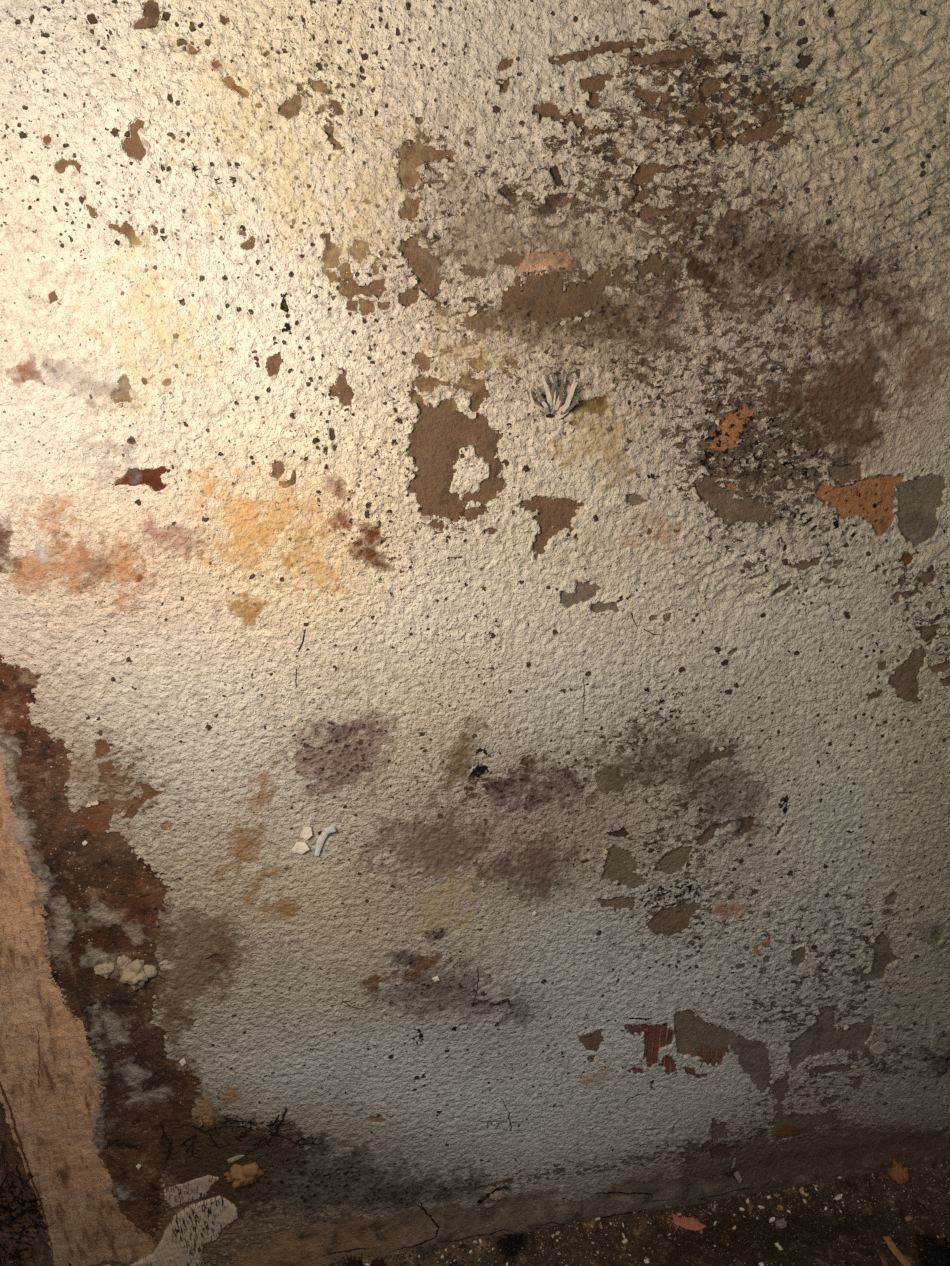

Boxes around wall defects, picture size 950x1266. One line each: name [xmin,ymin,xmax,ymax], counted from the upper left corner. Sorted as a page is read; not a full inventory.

peeling [533,31,793,167]
peeling [311,138,454,315]
water stain [687,212,905,333]
peeling [114,465,177,494]
peeling [406,352,506,534]
peeling [519,494,584,560]
water stain [578,350,888,482]
water stain [779,484,892,543]
water stain [444,720,582,807]
water stain [0,655,489,1238]
water stain [641,881,702,909]
peeling [624,1006,888,1141]